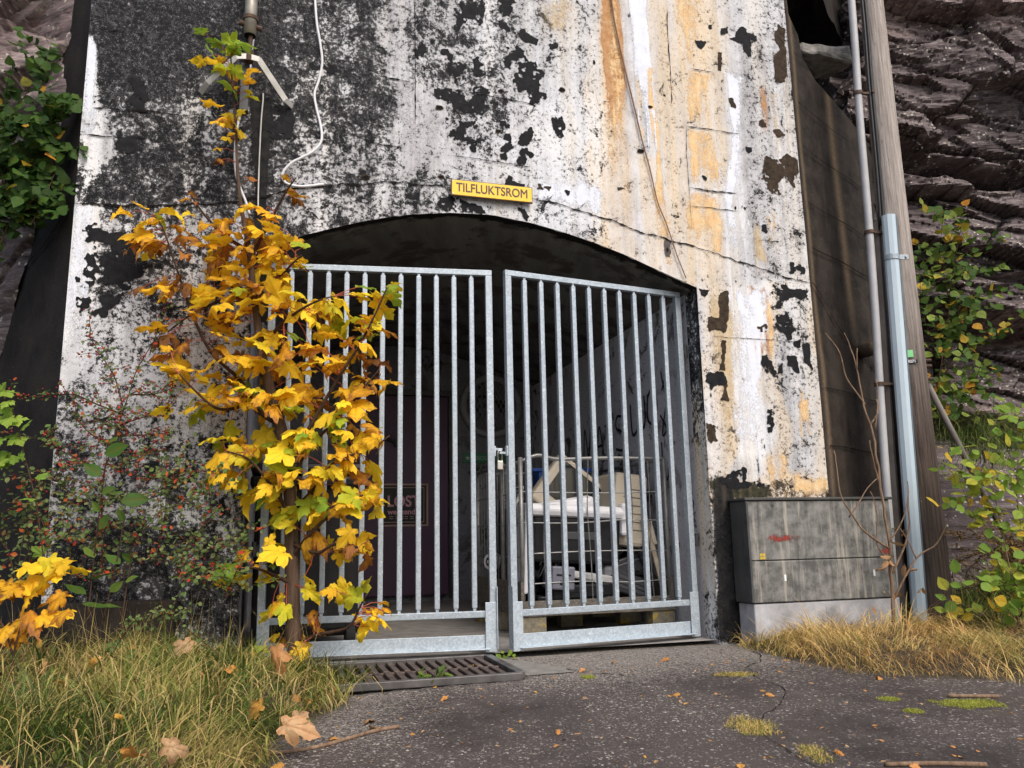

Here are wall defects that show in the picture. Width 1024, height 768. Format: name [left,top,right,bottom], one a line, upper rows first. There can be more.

water stain [82,38,97,144]
water stain [248,97,272,254]
peeling [434,49,490,152]
peeling [453,0,558,105]
peeling [498,121,534,165]
peeling [551,116,566,138]
rust [600,0,626,156]
peeling [761,153,799,195]
crack [533,195,874,367]
peeling [699,288,729,402]
peeling [757,262,813,376]
peeling [767,409,775,433]